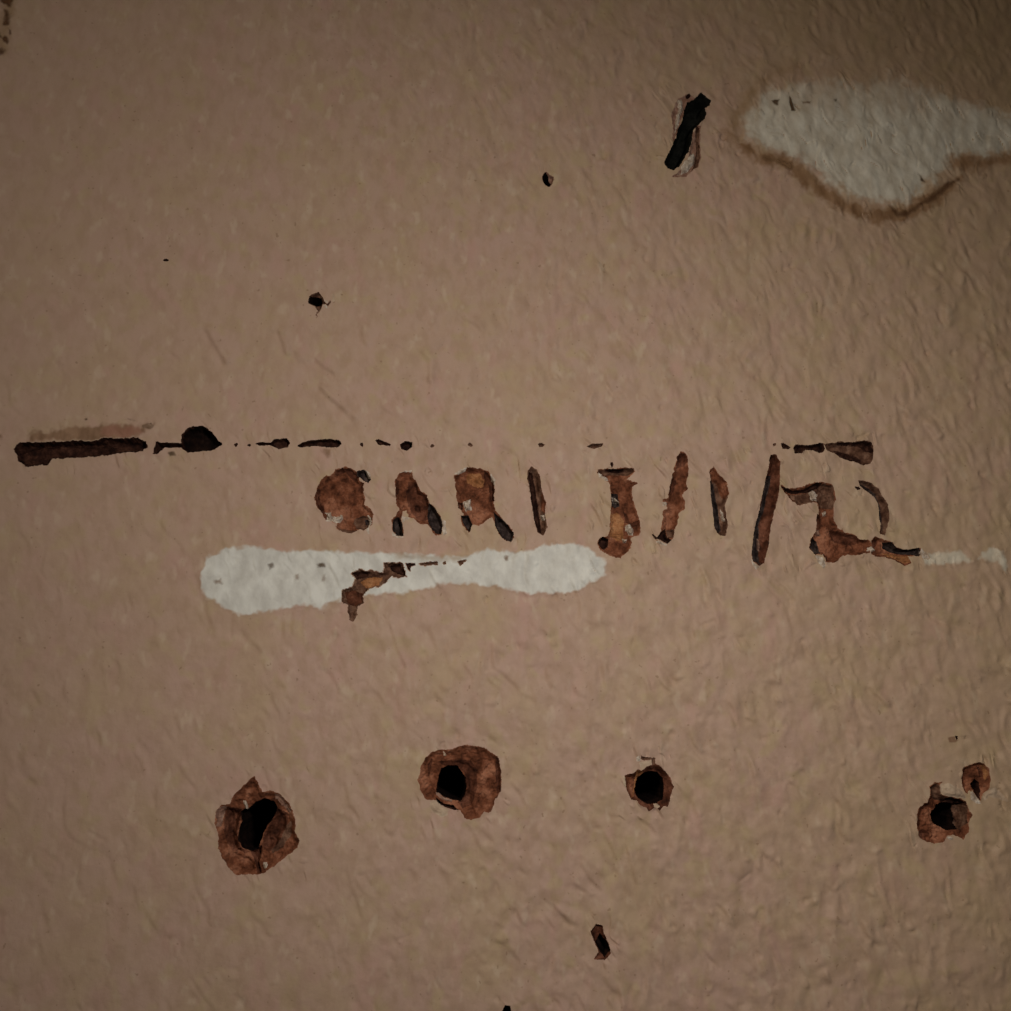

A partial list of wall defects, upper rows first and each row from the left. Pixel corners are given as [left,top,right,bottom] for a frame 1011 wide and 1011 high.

spalling [664,93,711,177]
damp [710,53,1011,232]
peeling [342,560,466,622]
spalling [866,547,929,563]
spalling [214,776,299,875]
spalling [418,744,502,820]
spalling [623,755,674,811]
spalling [917,762,1008,844]